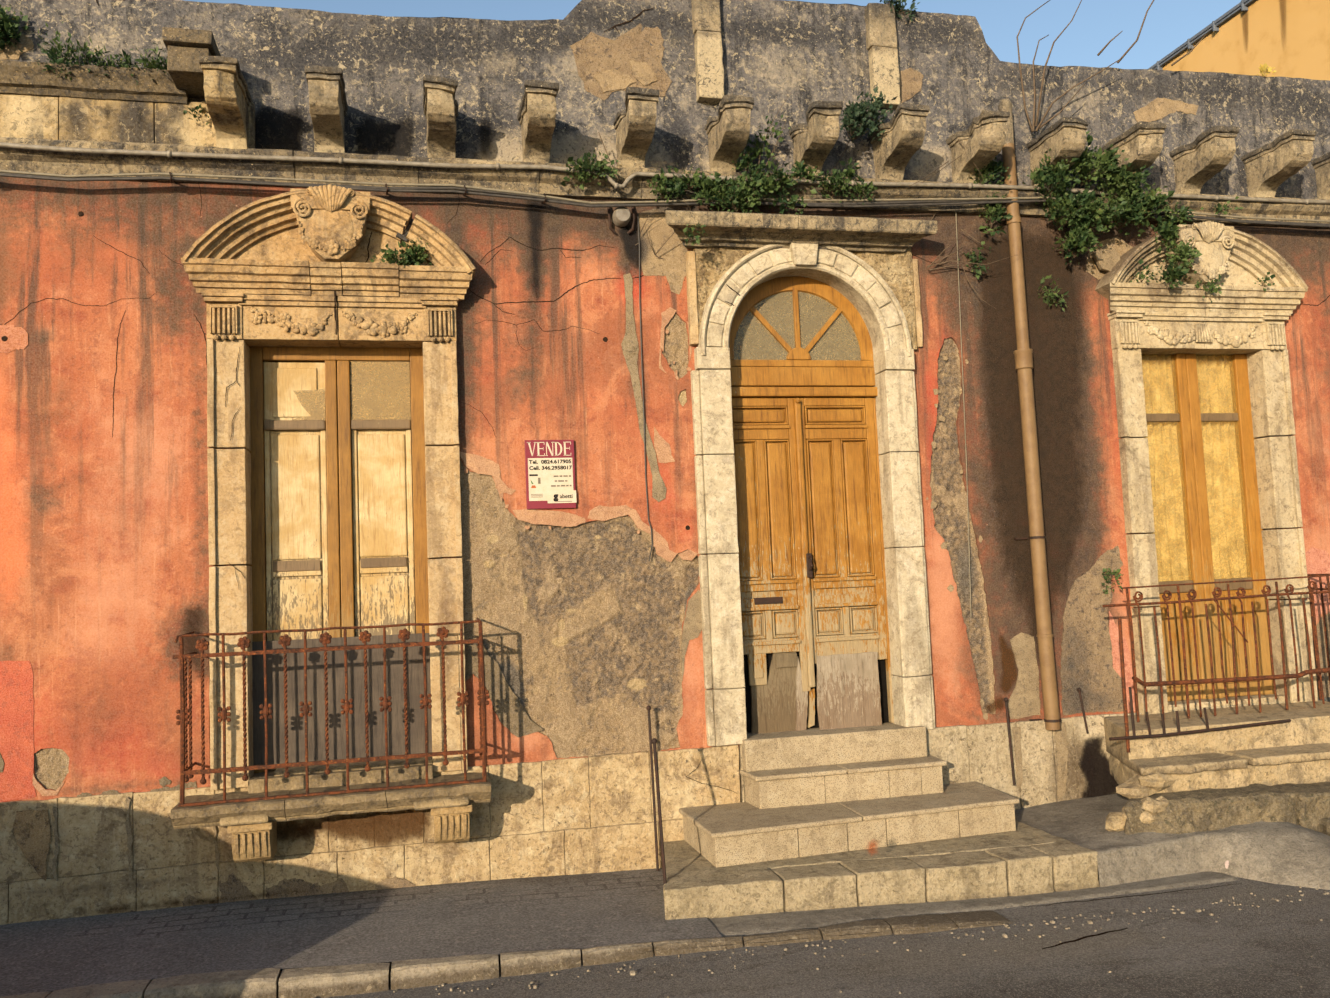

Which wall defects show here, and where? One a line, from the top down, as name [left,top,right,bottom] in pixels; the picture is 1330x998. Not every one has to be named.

spalling [570,24,672,101]
crack [0,235,184,437]
crack [468,237,685,351]
flaking render [460,452,702,759]
peeling [654,427,675,463]
flaking render [639,206,692,407]
flaking render [926,338,996,720]
leakage [987,637,1017,713]
leakage [981,237,1081,634]
flaking render [1313,612,1330,698]